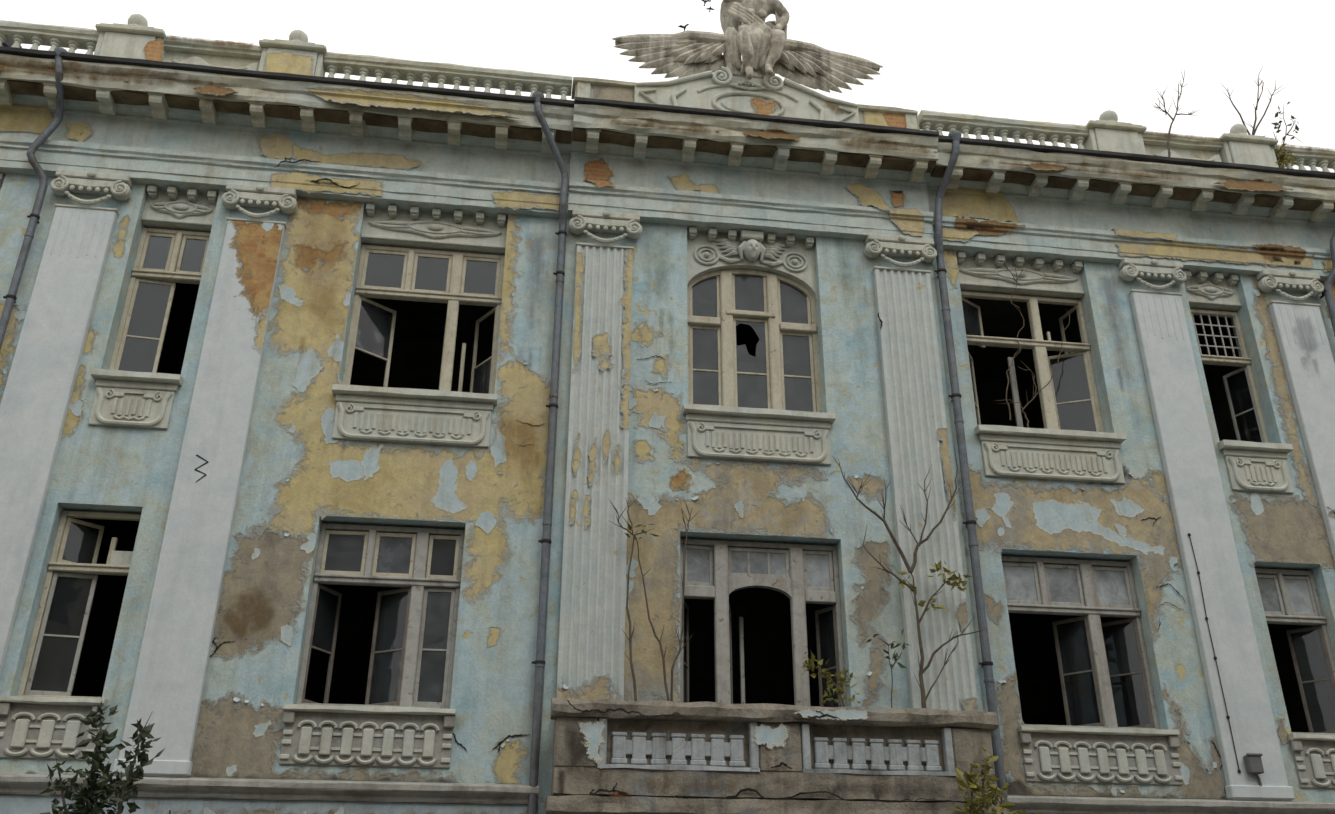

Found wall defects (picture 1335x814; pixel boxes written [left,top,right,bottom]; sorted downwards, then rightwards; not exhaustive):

flaking render [583,158,615,188]
peeling [0,300,27,402]
peeling [210,133,560,661]
peeling [1110,229,1335,571]
peeling [557,249,888,702]
peeling [936,428,1183,644]
flaking render [849,537,896,707]
crack [567,700,686,719]
crack [791,711,841,721]
crack [558,783,688,799]
crack [721,762,846,801]
crack [878,796,954,804]